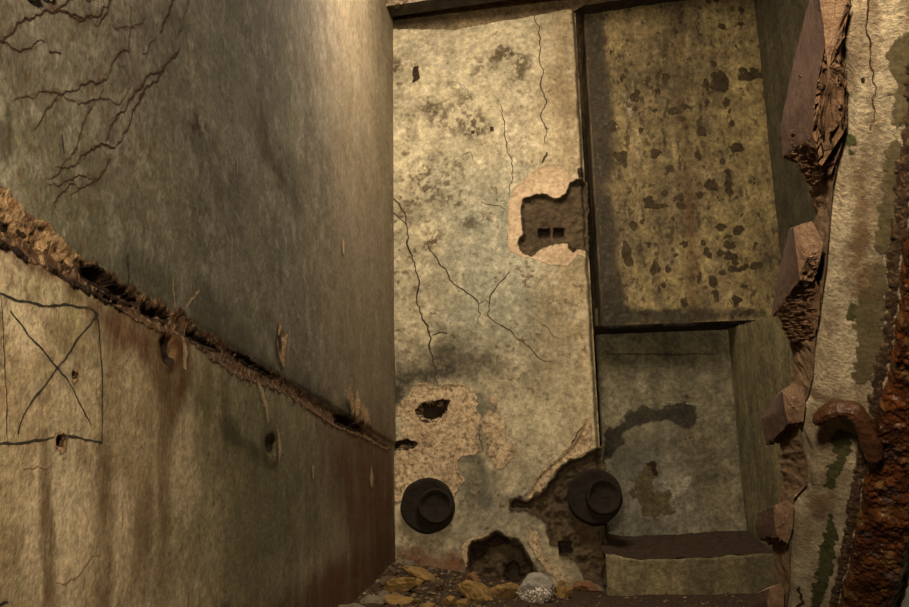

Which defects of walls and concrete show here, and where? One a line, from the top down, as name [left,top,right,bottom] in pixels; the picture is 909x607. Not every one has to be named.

crack [0,0,189,212]
crack [481,106,513,209]
crack [534,15,548,163]
flaking render [507,164,589,266]
leakage [581,20,763,326]
peeling [695,143,744,201]
spalling [0,187,288,465]
crack [393,198,550,387]
flaking render [394,382,517,503]
spalling [462,416,608,587]
leakage [601,395,697,458]
peeling [812,400,884,463]